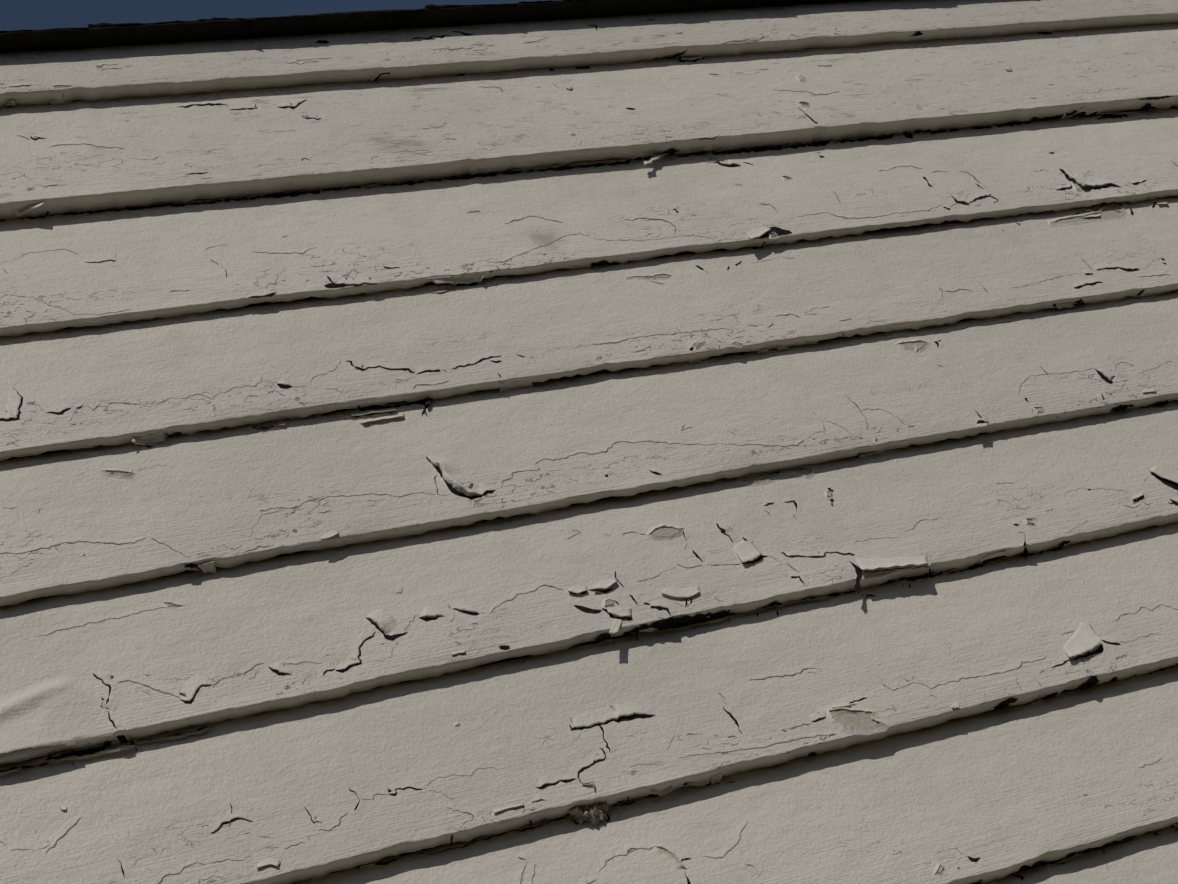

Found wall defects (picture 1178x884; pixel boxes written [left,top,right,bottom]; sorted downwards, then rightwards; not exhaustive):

crack [0,249,131,315]
crack [0,306,887,421]
peeling [1123,466,1178,508]
peeling [602,524,705,562]
peeling [834,555,932,598]
peeling [568,571,632,645]
crack [93,581,565,729]
crack [747,665,828,680]
peeling [1041,622,1120,672]
peeling [810,694,889,735]
crack [536,693,834,789]
crack [685,872,701,884]